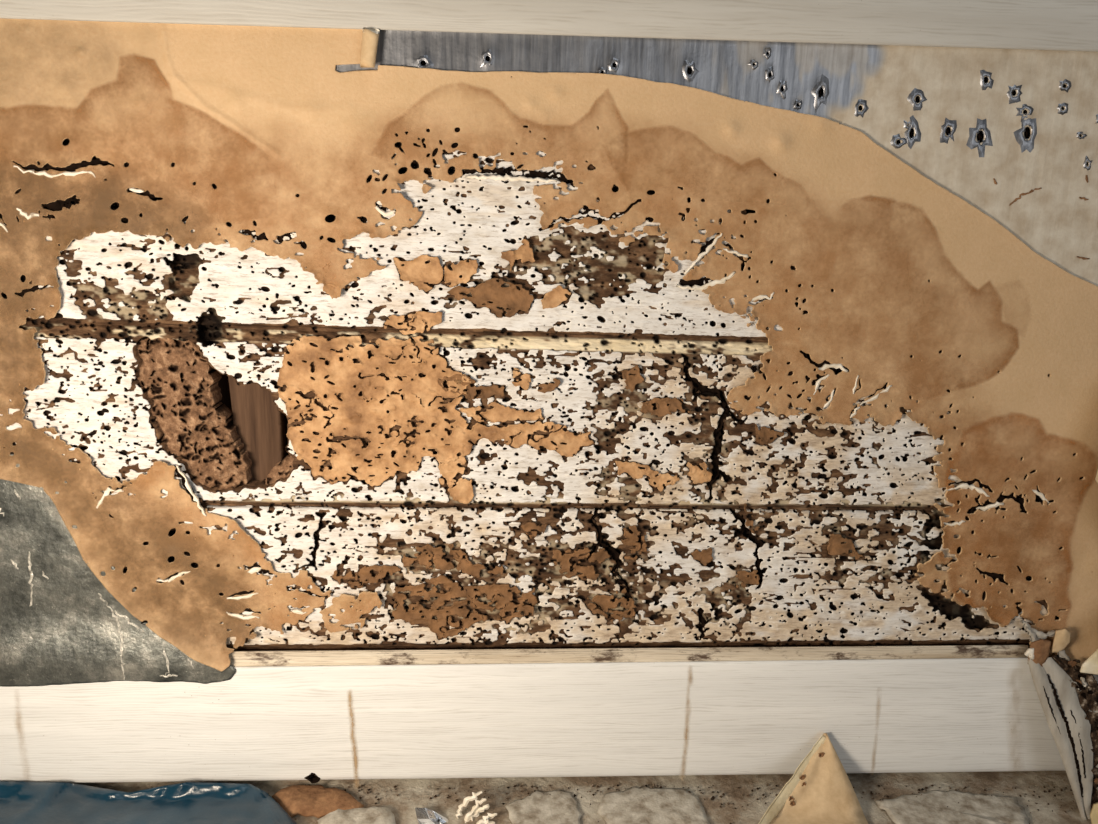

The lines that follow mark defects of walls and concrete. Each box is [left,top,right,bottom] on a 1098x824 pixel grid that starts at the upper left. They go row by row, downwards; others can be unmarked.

leakage [0,100,87,115]
leakage [133,56,201,114]
leakage [0,174,146,266]
peeling [25,150,783,337]
leakage [0,265,37,322]
leakage [969,282,1018,379]
leakage [0,432,74,491]
peeling [0,337,1048,660]
crack [680,357,764,589]
leakage [133,515,243,637]
crack [590,508,631,598]